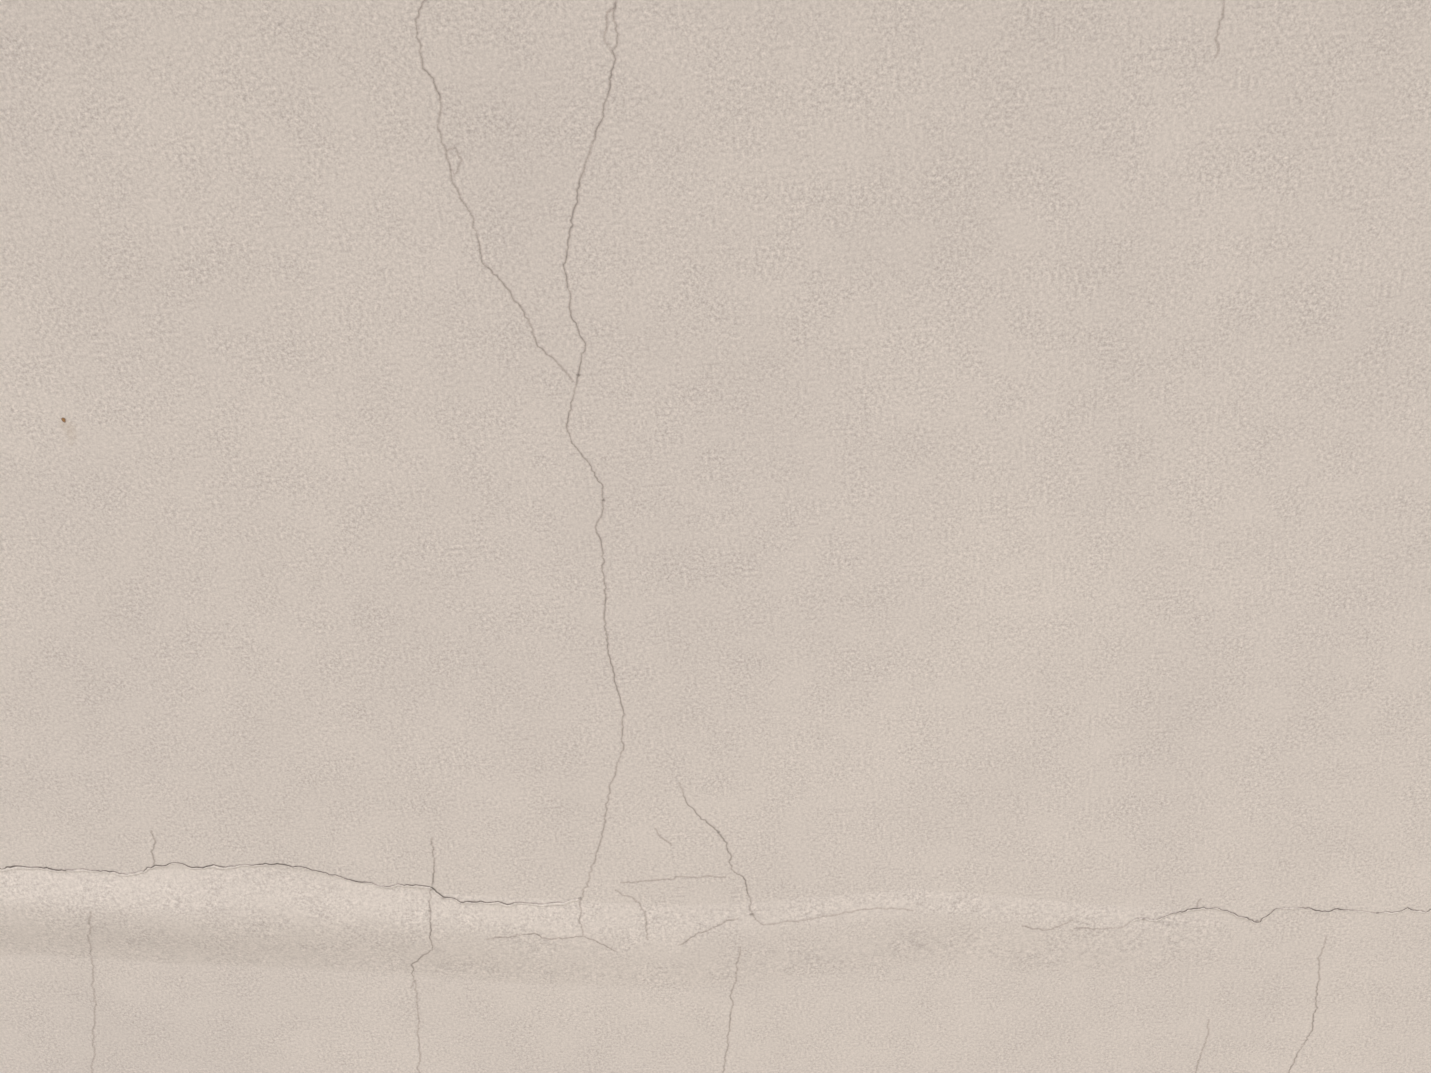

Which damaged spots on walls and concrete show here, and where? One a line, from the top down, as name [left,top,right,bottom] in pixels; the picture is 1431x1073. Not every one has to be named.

crack [0,863,582,908]
crack [1132,907,1431,924]